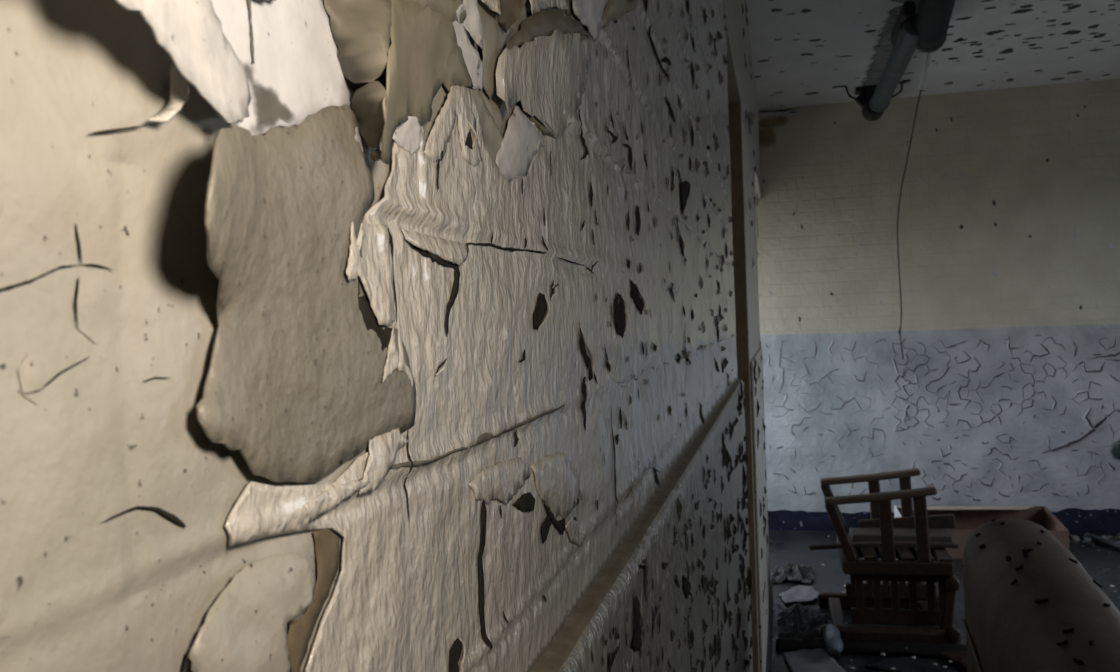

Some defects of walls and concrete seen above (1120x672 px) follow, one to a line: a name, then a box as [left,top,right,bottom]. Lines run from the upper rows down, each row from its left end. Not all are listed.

crack [0,224,114,328]
crack [387,228,397,322]
crack [463,243,598,274]
crack [29,357,89,393]
peeling [116,0,729,672]
peeling [592,57,768,672]
crack [765,335,1120,502]
crack [102,506,187,527]